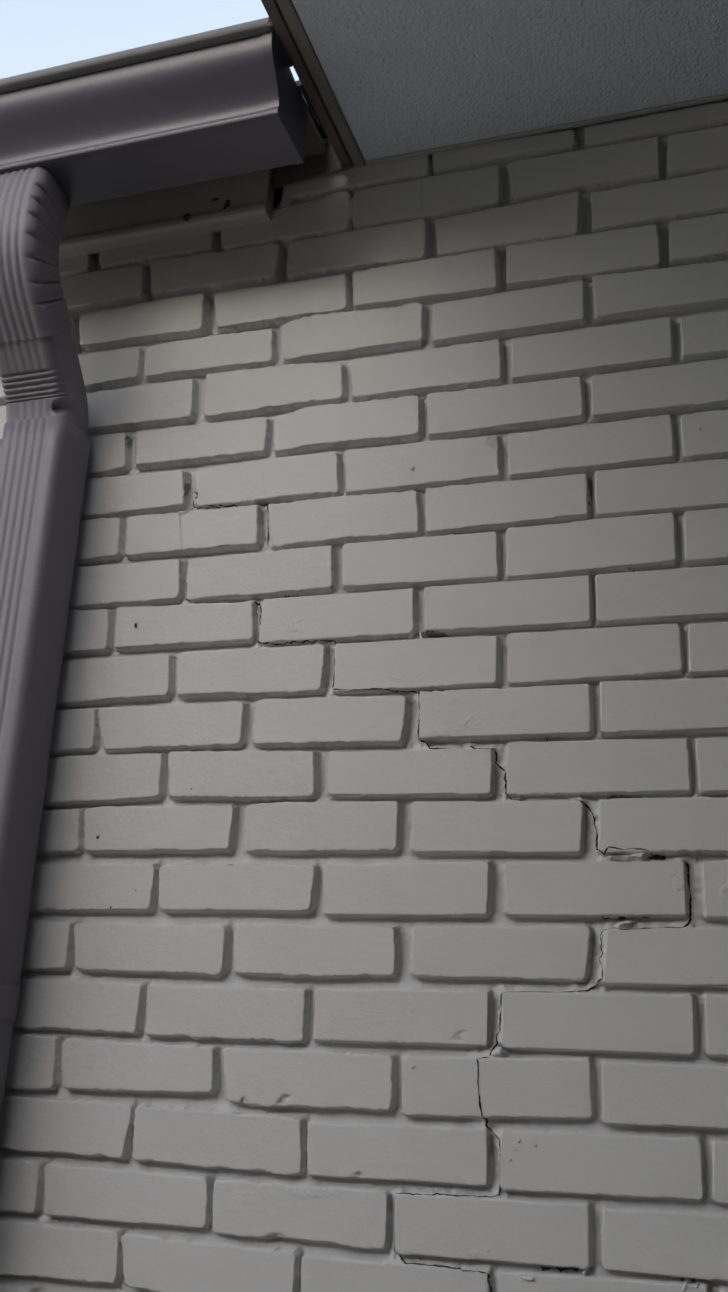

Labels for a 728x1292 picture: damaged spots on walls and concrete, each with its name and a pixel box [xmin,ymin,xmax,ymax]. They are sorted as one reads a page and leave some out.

crack [193,501,269,545]
crack [253,601,653,855]
crack [477,860,692,1149]
crack [394,1182,501,1292]